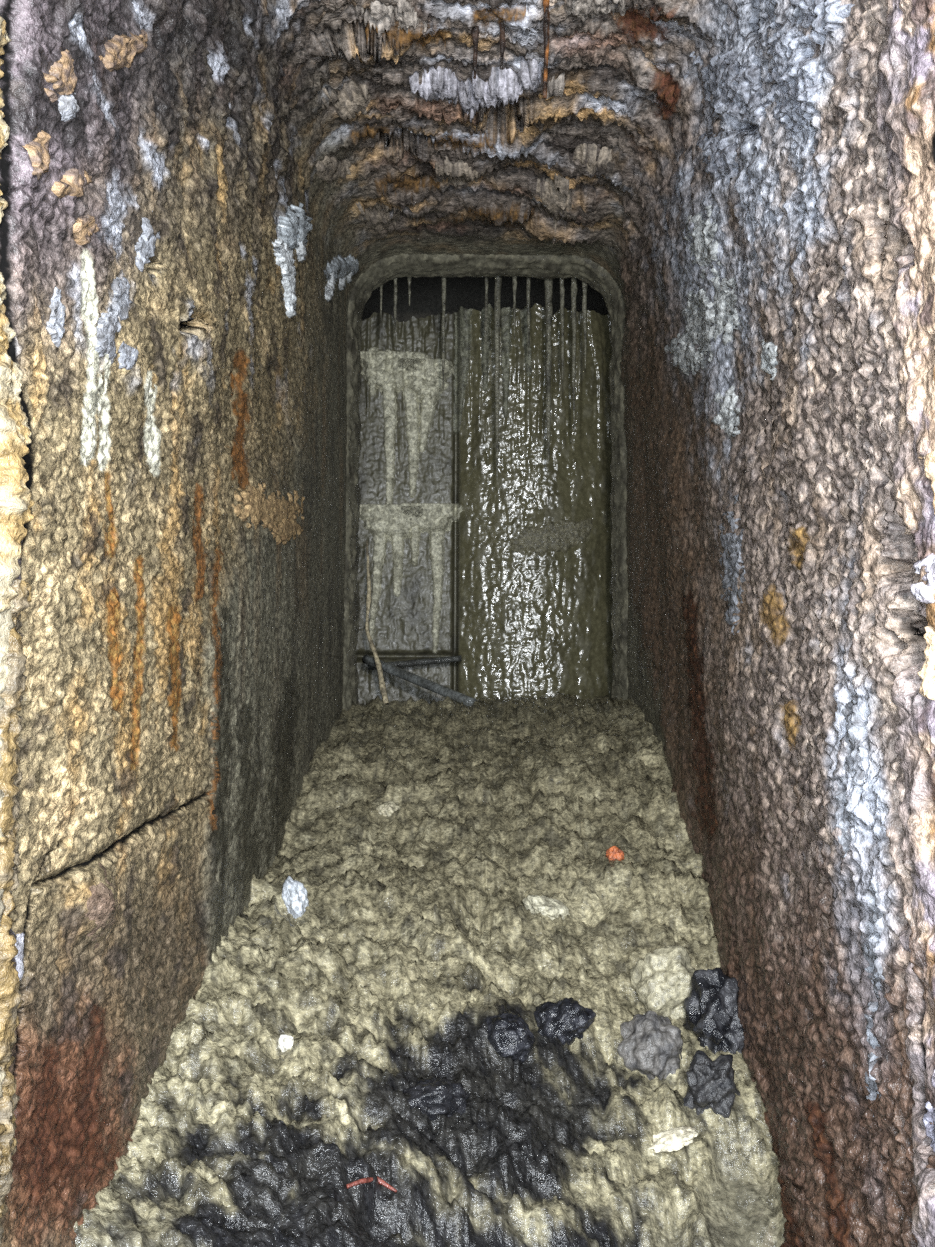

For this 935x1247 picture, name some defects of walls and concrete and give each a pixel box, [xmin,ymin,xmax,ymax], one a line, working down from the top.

crack [0,0,34,549]
damp [80,250,114,471]
corrosion [105,473,117,557]
corrosion [106,556,147,769]
damp [143,372,161,476]
corrosion [167,606,181,751]
corrosion [192,484,223,740]
corrosion [231,349,250,489]
crack [13,792,207,1078]